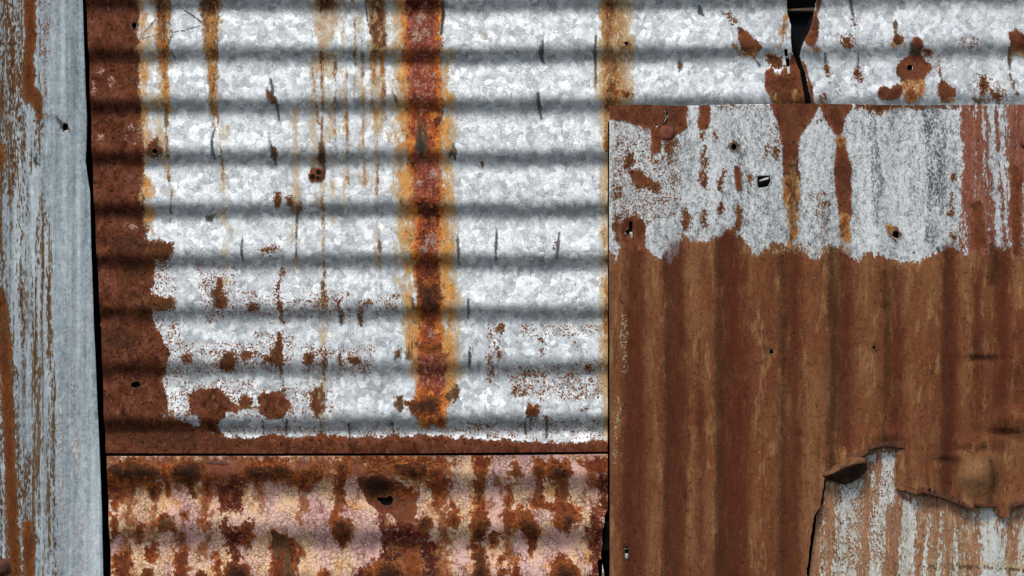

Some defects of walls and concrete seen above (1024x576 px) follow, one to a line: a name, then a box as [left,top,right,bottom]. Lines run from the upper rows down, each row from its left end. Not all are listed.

rust [0,0,59,576]
rust [86,0,608,576]
rust [574,0,1024,576]